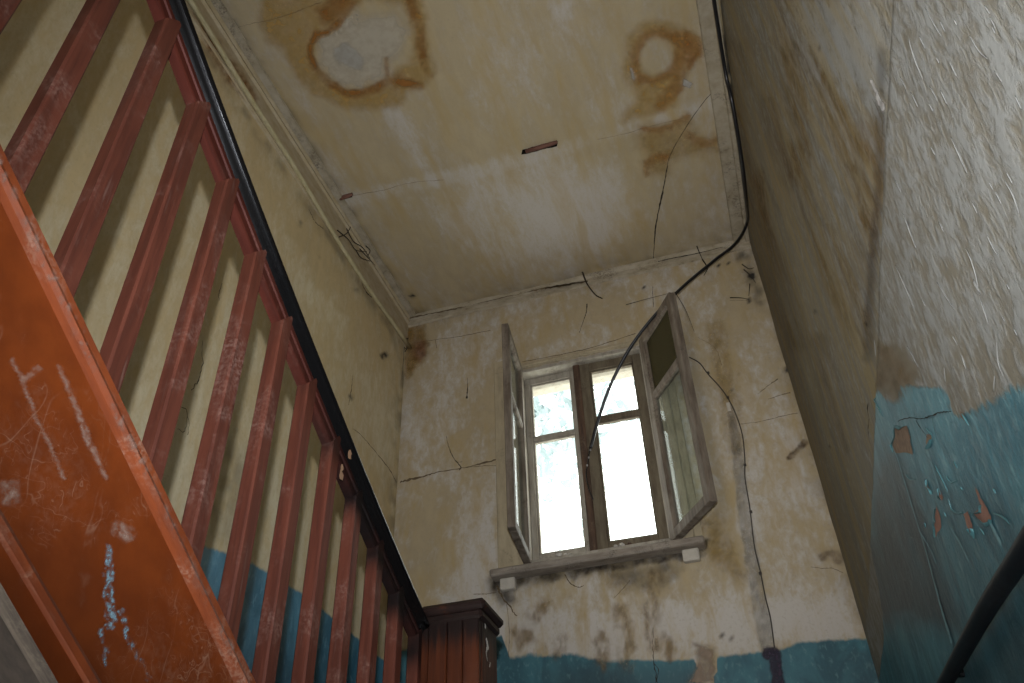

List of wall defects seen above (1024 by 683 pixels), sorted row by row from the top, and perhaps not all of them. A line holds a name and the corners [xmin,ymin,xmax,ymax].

leakage [265,0,426,104]
crack [601,94,722,262]
crack [355,430,496,483]
peeling [889,425,932,455]
crack [898,411,951,438]
peeling [905,461,1010,539]